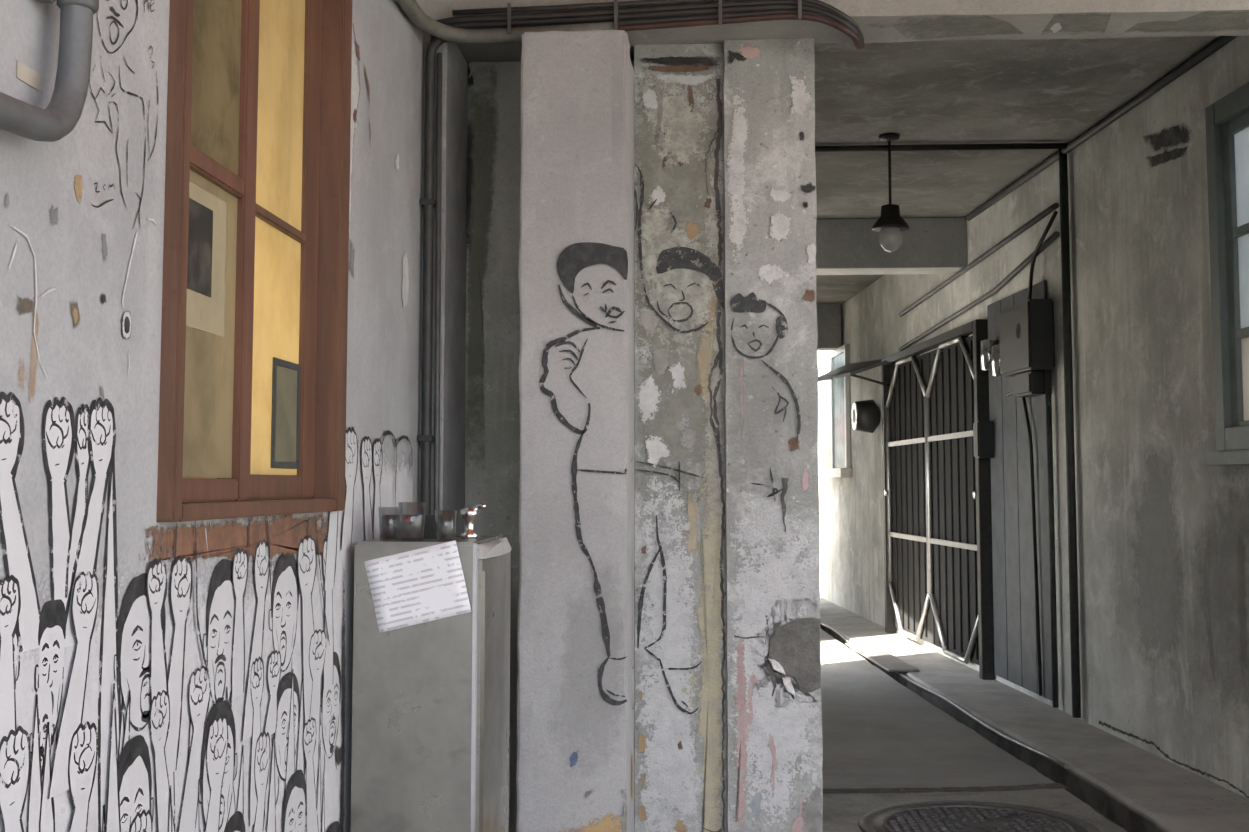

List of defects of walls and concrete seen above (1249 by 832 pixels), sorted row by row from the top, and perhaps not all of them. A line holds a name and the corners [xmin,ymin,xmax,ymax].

peeling [559,45,822,832]